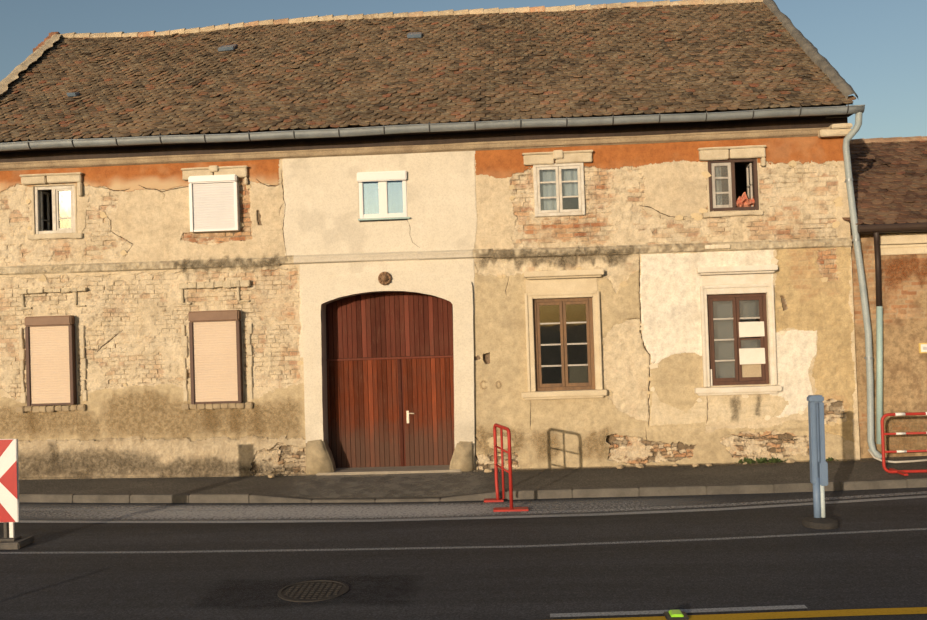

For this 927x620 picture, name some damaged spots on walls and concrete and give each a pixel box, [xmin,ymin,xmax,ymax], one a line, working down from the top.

crack [100,185,189,197]
flaking render [0,177,304,400]
flaking render [474,160,843,460]
crack [625,256,655,445]
flaking render [823,398,847,426]
leakage [18,446,289,477]
flaking render [250,442,306,476]
flaking render [606,434,695,465]